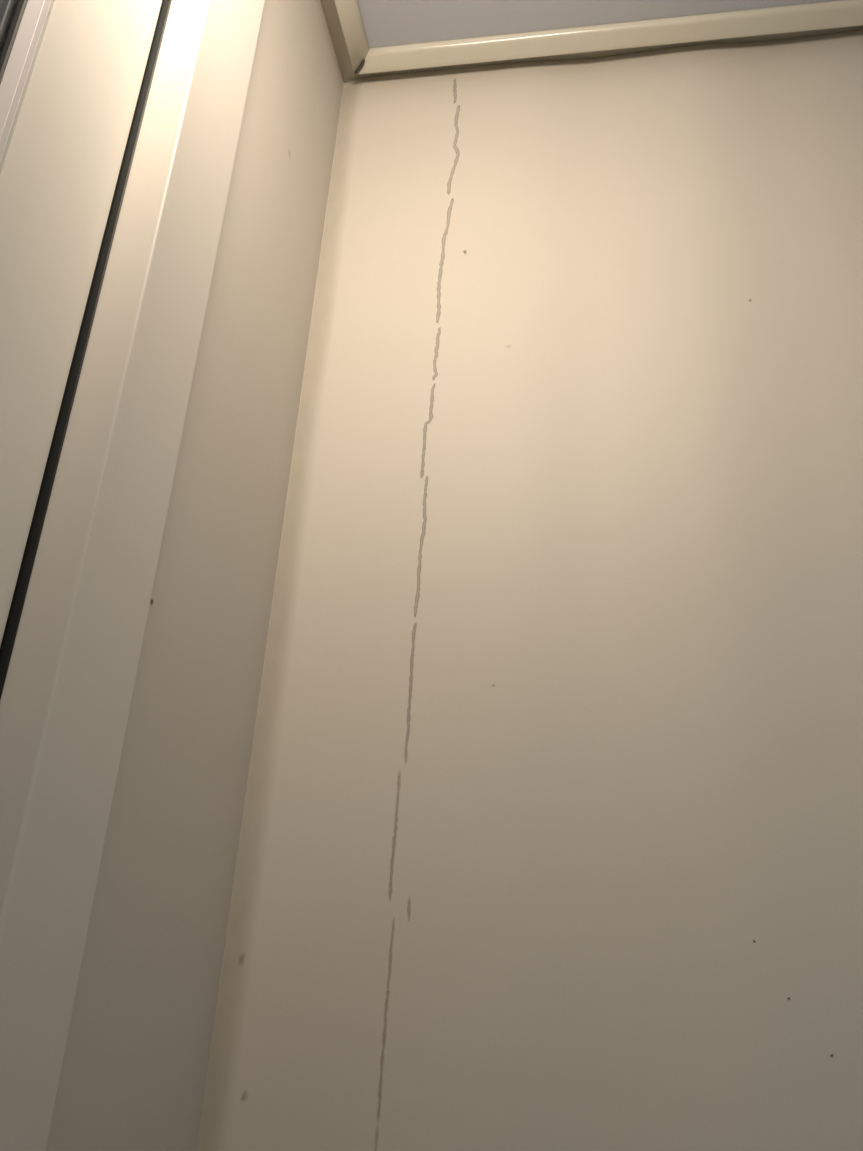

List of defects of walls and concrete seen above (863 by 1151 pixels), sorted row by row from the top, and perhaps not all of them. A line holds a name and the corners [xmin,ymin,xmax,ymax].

crack [405,80,460,758]
crack [389,793,398,896]